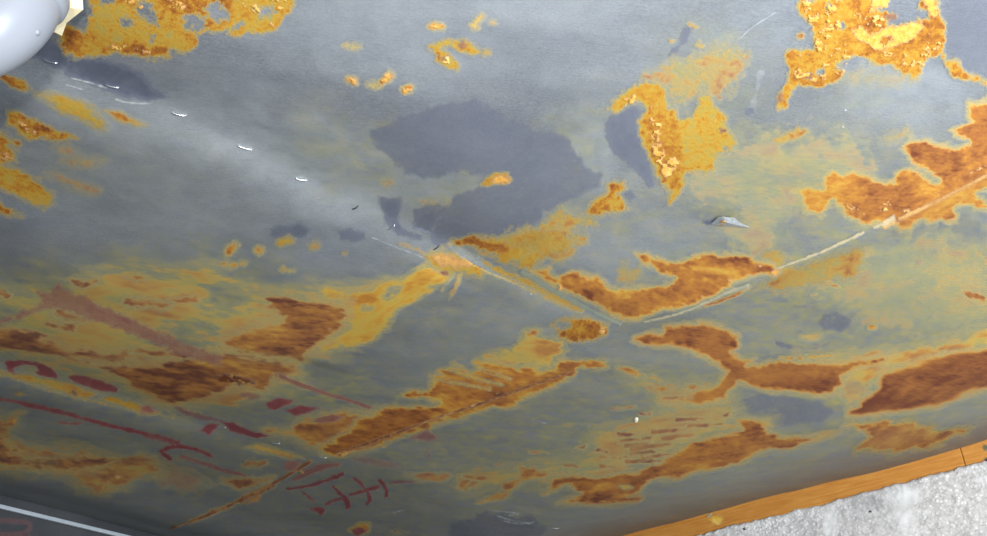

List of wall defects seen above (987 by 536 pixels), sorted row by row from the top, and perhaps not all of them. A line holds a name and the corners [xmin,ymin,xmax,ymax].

rust [0,111,99,218]
rust [0,74,145,130]
rust [57,0,295,61]
rust [345,71,394,88]
rust [428,22,491,71]
damp [372,100,601,245]
rust [480,172,512,187]
rust [608,41,749,205]
rust [773,128,808,144]
rust [776,0,987,111]
rust [791,100,987,232]
rust [0,181,987,507]